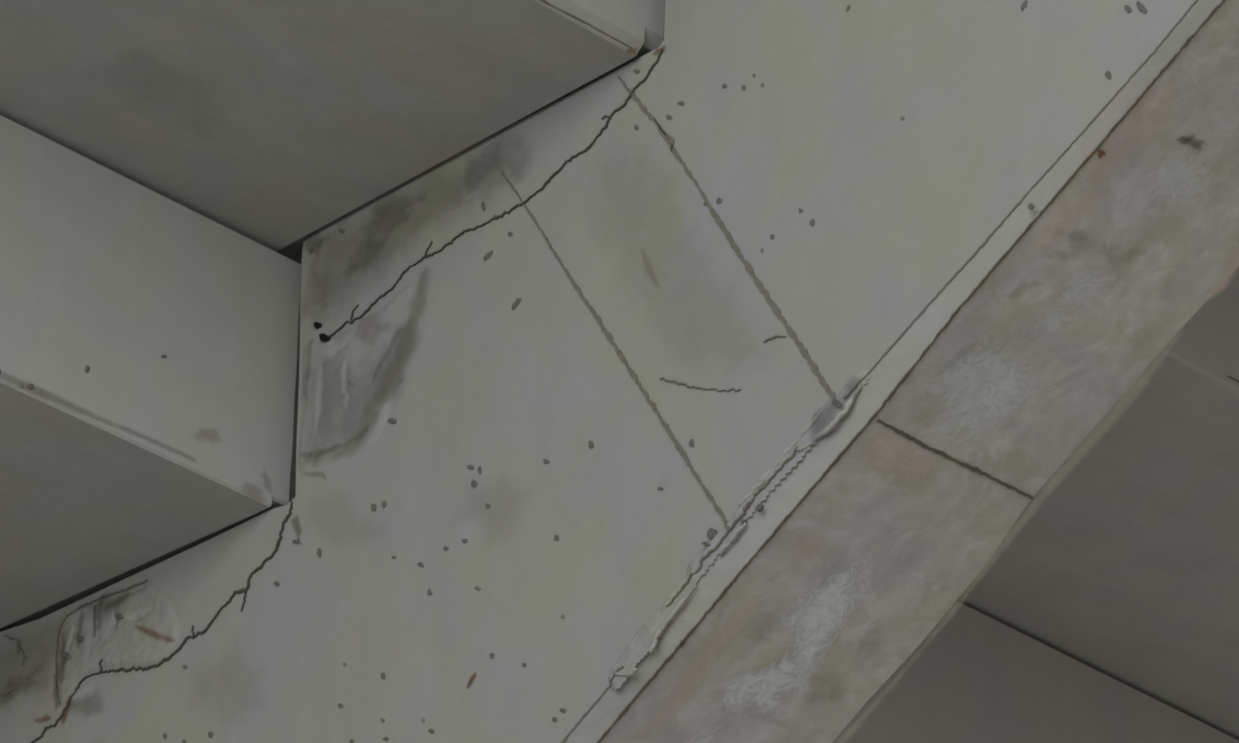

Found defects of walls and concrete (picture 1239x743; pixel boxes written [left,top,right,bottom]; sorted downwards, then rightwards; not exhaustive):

crack [328,48,664,338]
crack [0,501,293,743]